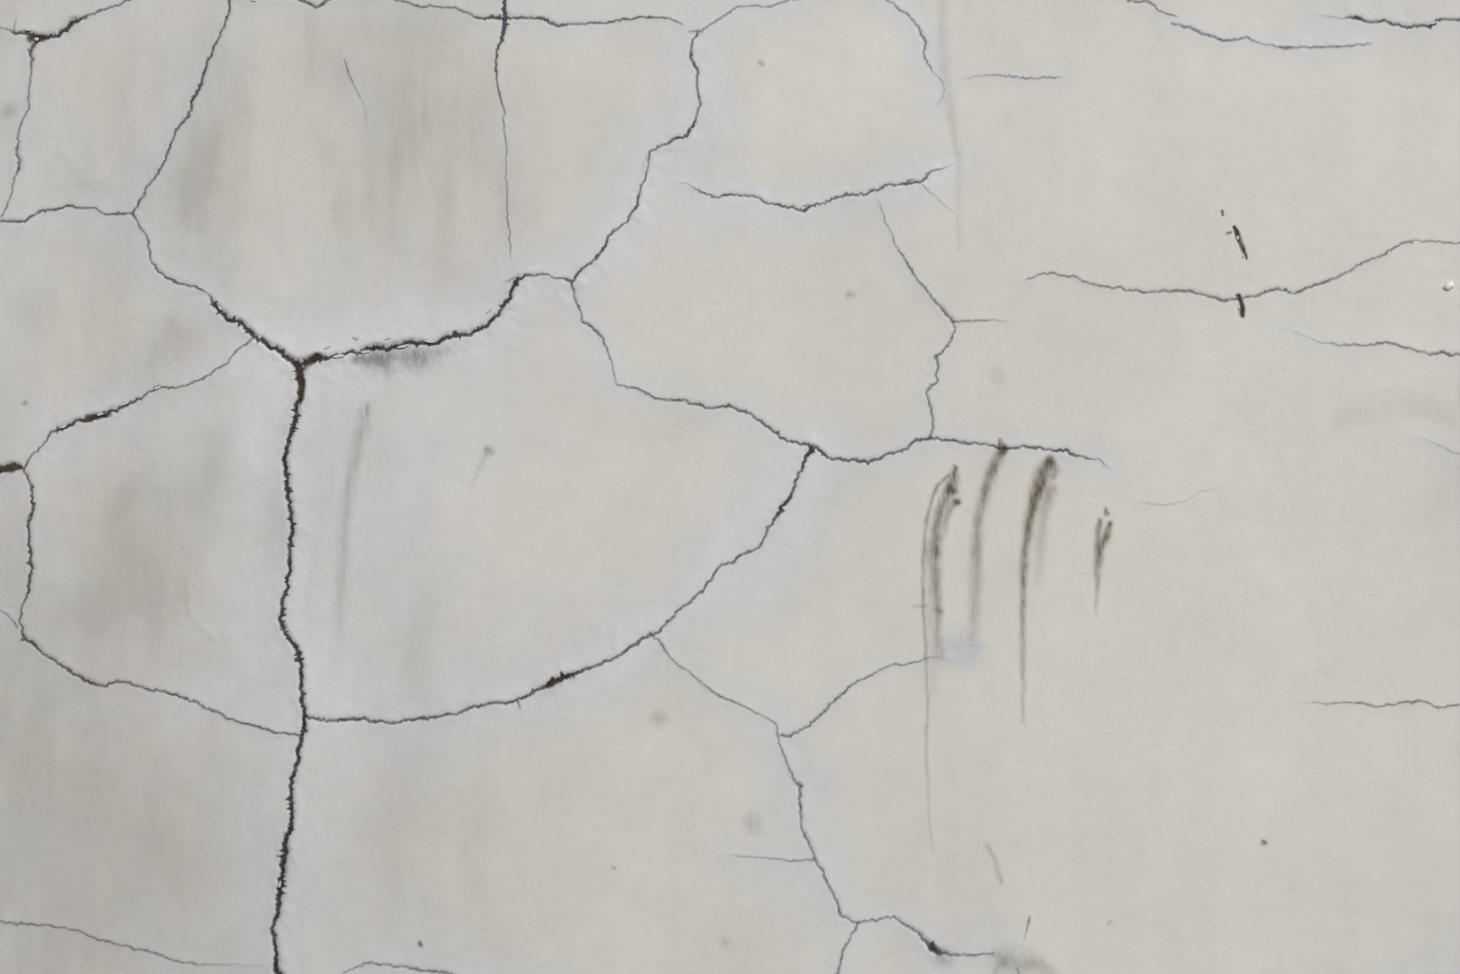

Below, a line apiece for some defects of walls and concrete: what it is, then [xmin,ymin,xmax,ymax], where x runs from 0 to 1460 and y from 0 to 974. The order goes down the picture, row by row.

crack [1351,16,1459,28]
crack [1377,342,1456,356]
crack [0,0,1076,974]
water stain [1026,458,1052,540]